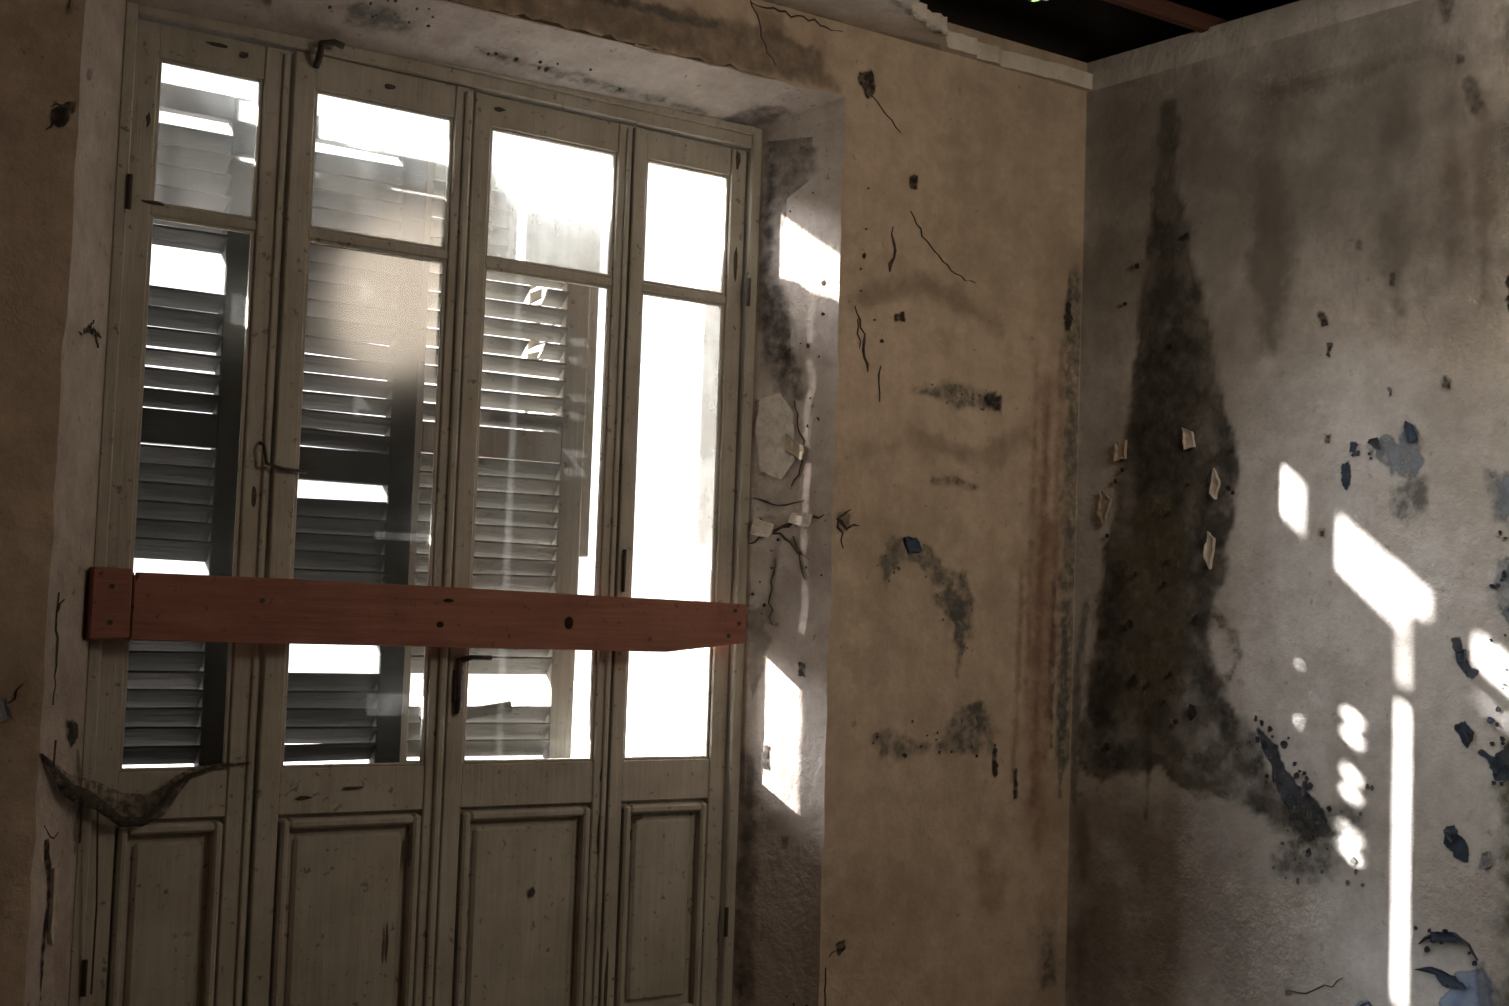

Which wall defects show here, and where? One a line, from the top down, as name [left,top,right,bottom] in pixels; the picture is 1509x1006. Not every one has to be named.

peeling [1341,421,1427,516]
crack [749,497,859,625]
peeling [1489,472,1509,642]
crack [0,592,65,722]
peeling [1451,637,1479,679]
peeling [1454,668,1509,825]
peeling [1443,825,1509,886]
peeling [1414,926,1509,1006]